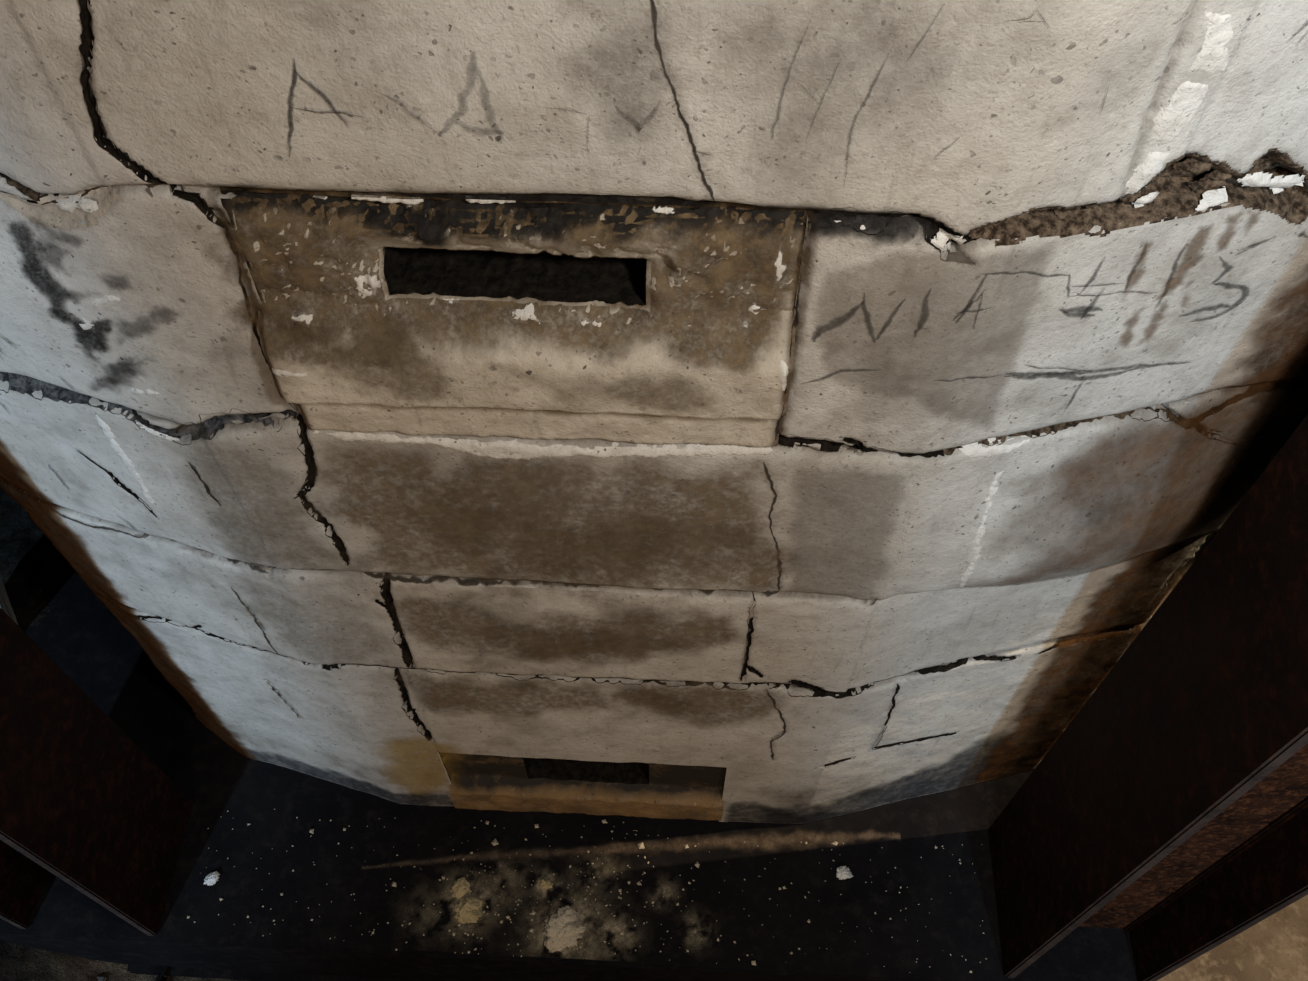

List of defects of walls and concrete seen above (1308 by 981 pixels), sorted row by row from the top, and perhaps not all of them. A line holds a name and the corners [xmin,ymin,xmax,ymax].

crack [78,0,271,371]
peeling [351,191,425,207]
peeling [653,206,675,214]
crack [650,0,715,202]
spalling [931,11,1308,251]
damp [224,188,806,398]
crack [78,451,157,518]
crack [289,403,350,566]
damp [337,452,783,590]
crack [375,573,432,741]
damp [401,600,730,661]
crack [825,641,1059,767]